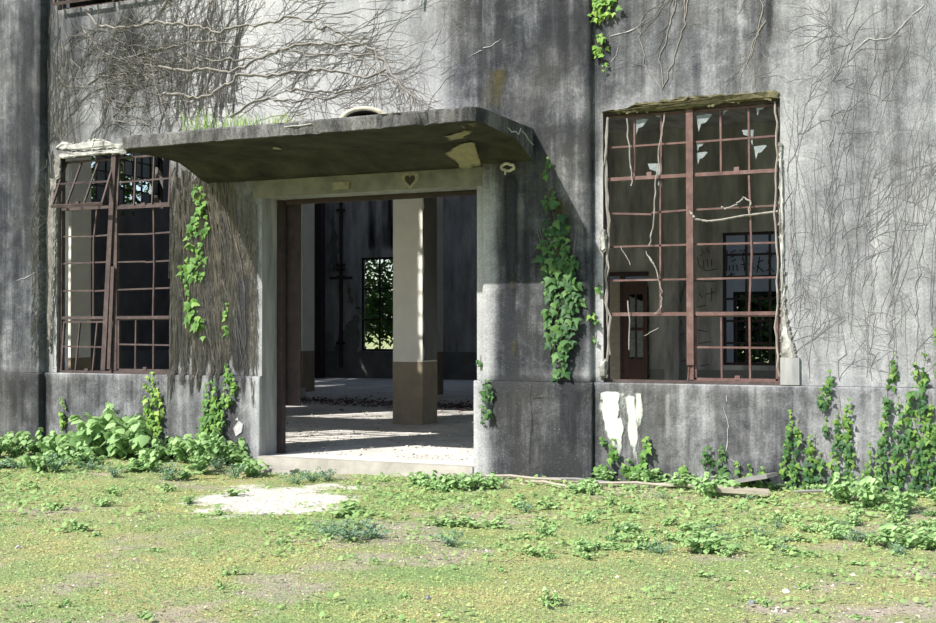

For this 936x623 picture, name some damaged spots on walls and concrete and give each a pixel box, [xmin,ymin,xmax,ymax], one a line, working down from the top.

leakage [15,0,34,218]
peeling [443,123,481,169]
leakage [504,175,516,296]